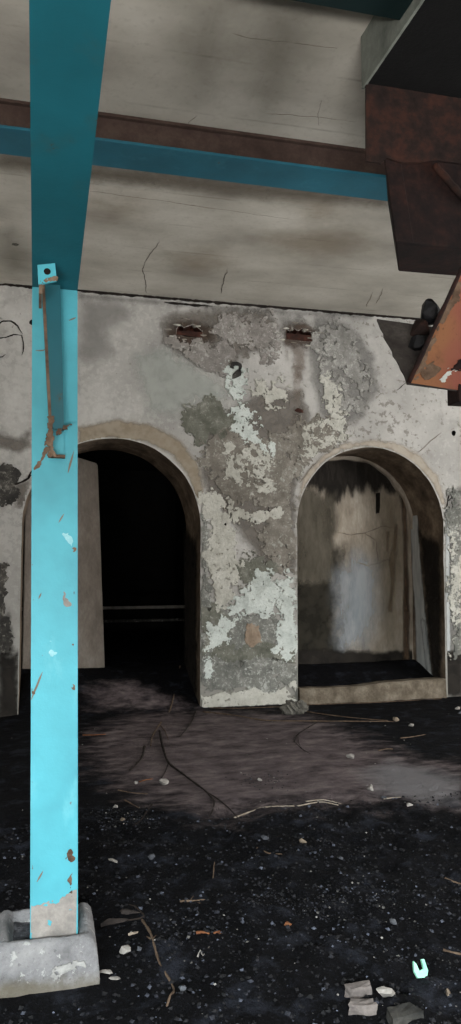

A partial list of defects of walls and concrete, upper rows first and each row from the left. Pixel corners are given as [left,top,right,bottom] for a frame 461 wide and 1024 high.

crack [0,282,32,290]
crack [78,244,420,320]
rust [414,278,461,380]
damp [0,434,29,451]
rust [44,415,72,458]
damp [79,390,450,675]
peeling [162,309,378,708]